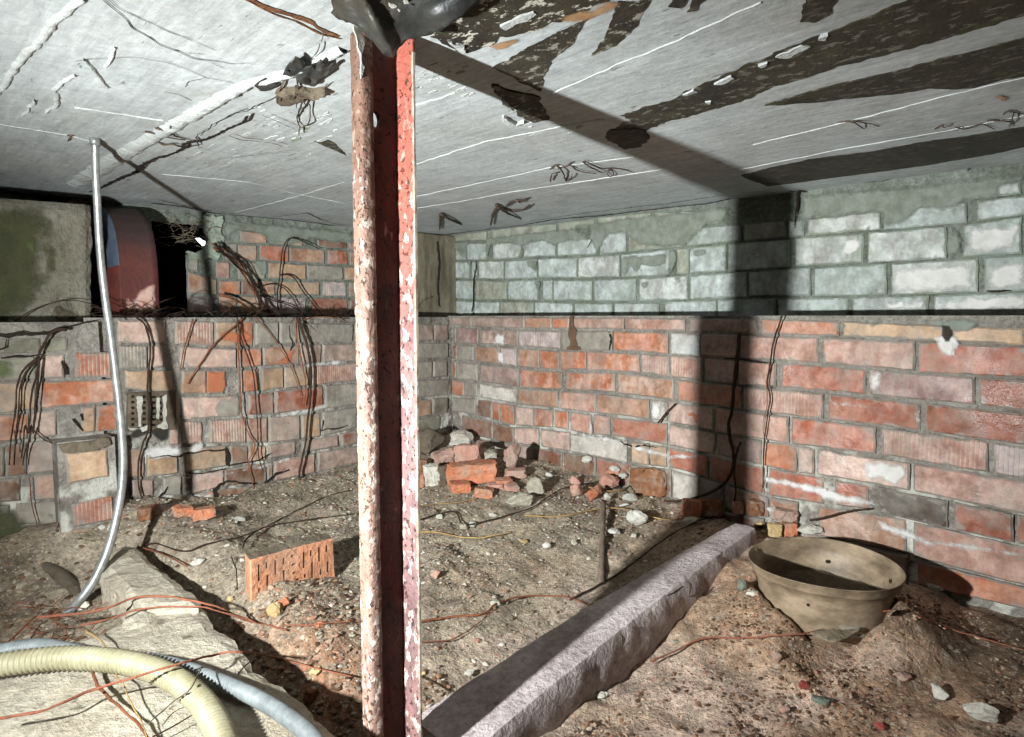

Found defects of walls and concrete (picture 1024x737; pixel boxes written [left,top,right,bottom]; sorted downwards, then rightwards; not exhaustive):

peeling [605,0,1024,150]
peeling [411,0,651,277]
peeling [741,127,1024,186]
hole [942,326,952,341]
efflorescence [865,462,905,484]